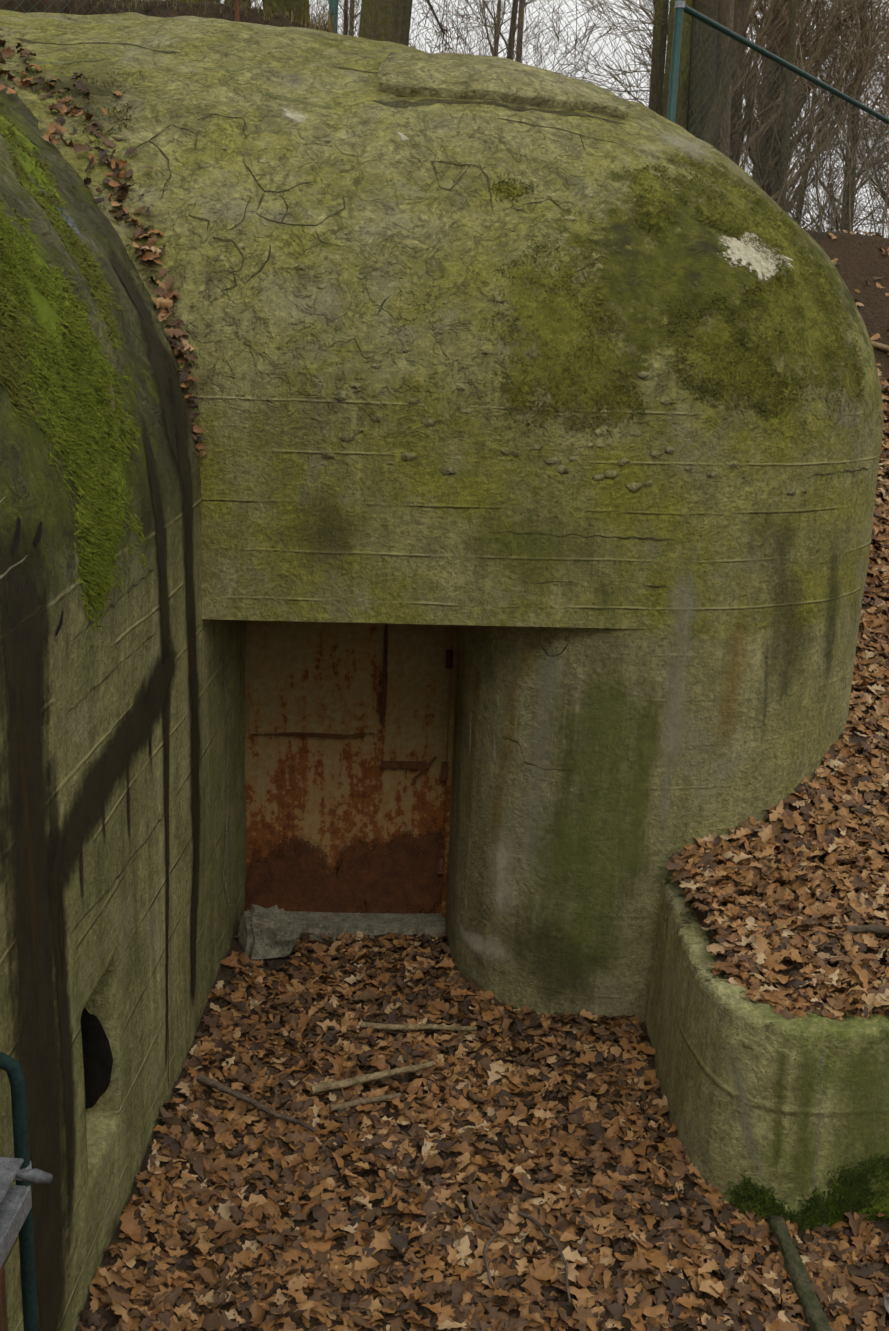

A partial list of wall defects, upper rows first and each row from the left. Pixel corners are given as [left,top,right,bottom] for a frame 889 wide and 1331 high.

rust [253,623,388,739]
rust [245,828,444,914]